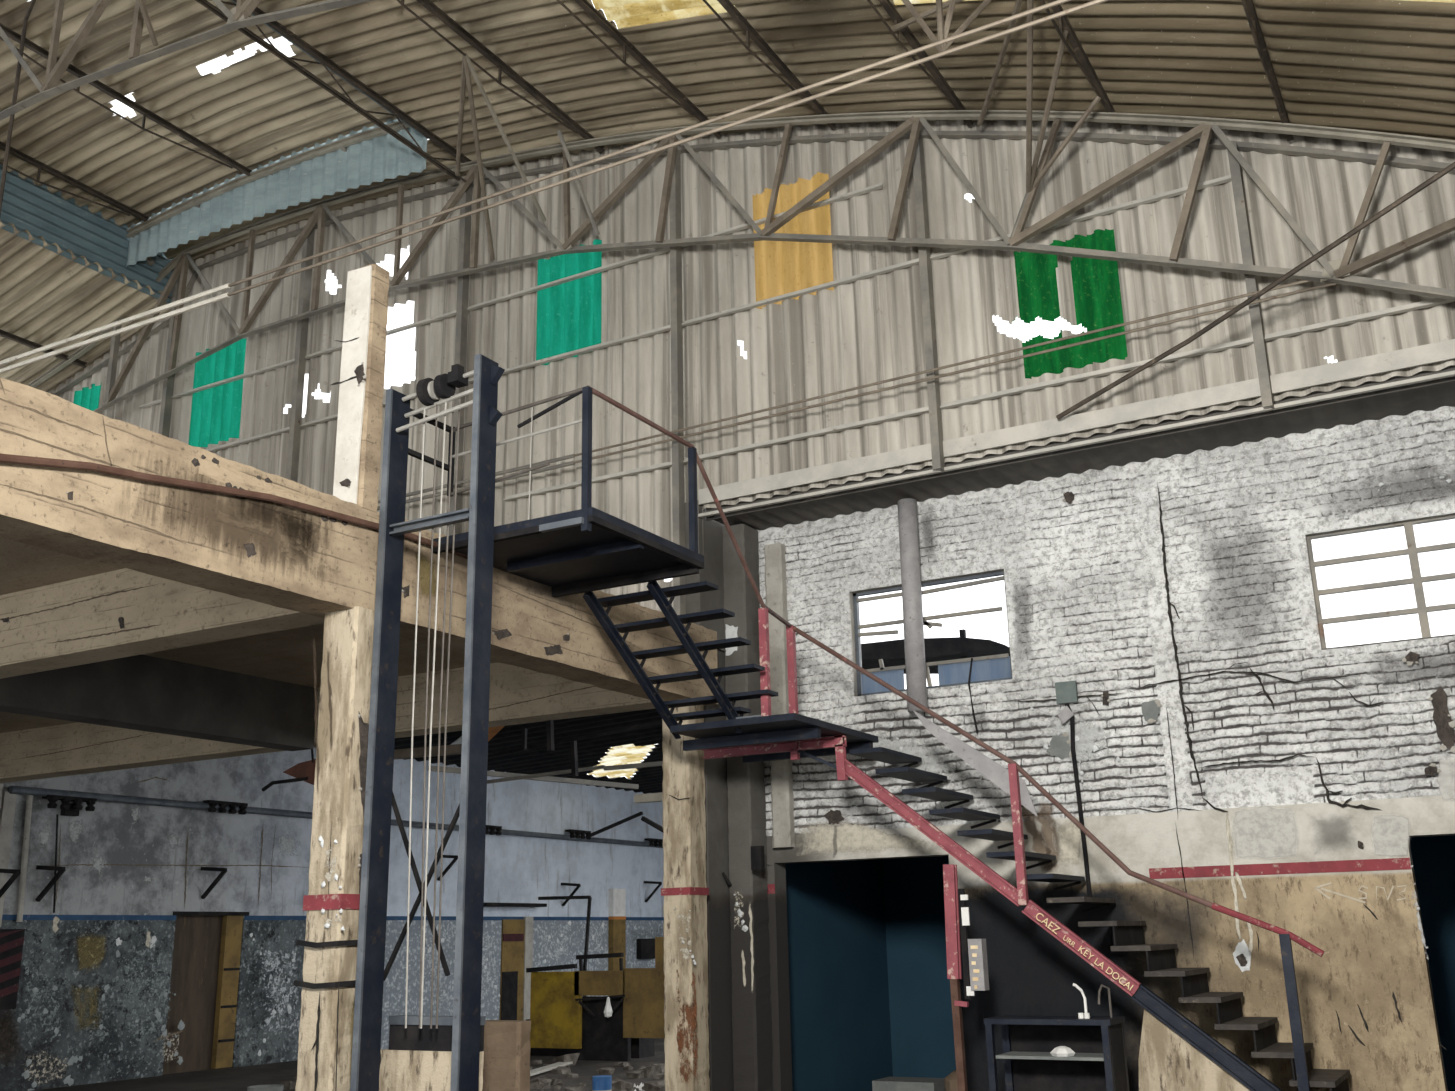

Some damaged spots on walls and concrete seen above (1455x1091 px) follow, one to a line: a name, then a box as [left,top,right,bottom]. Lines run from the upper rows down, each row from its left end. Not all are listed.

water stain [165,477,319,565]
crack [1014,484,1383,963]
spalling [1424,686,1455,776]